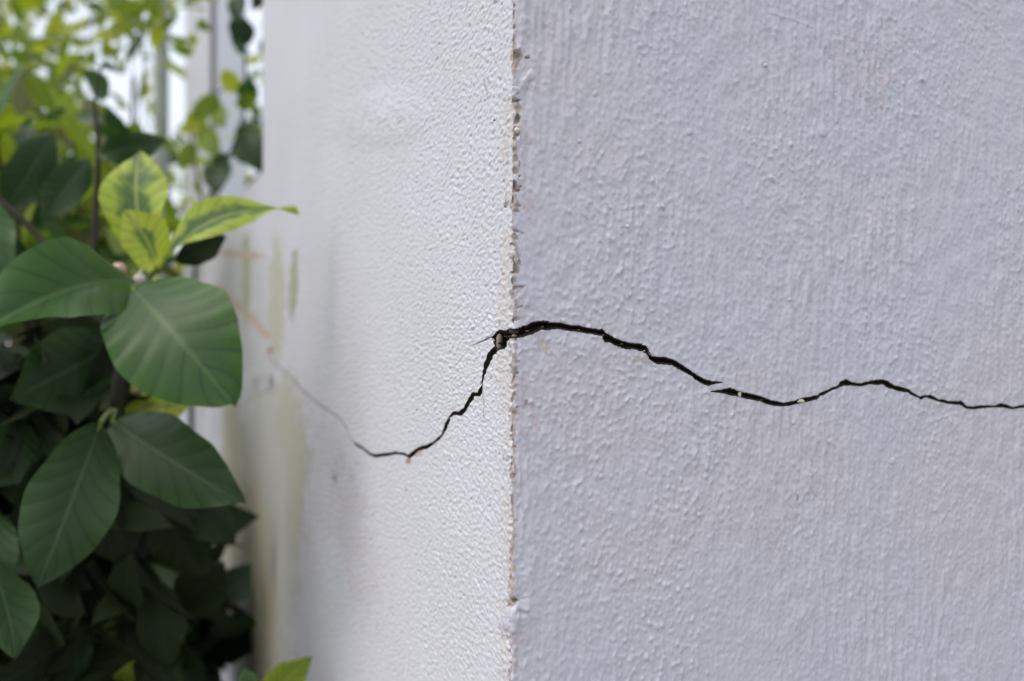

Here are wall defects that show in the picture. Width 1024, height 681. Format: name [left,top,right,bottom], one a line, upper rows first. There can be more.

crack [267,320,1024,458]